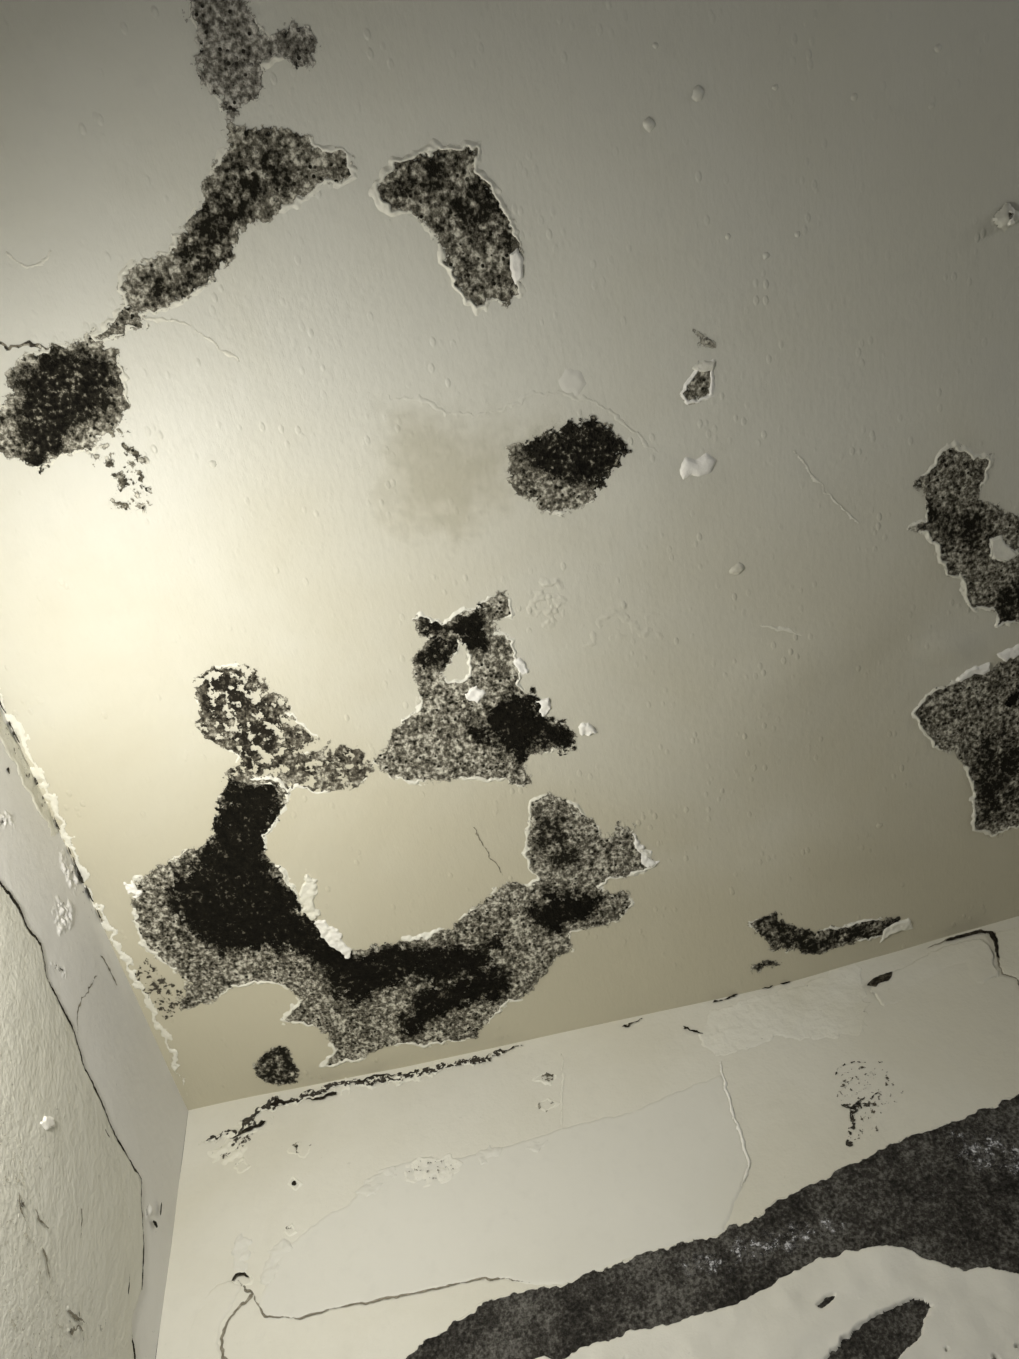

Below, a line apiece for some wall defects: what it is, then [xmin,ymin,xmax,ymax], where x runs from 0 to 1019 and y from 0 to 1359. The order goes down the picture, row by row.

peeling [0,0,526,513]
peeling [505,415,632,517]
peeling [906,440,1019,628]
peeling [123,590,660,1068]
peeling [911,644,1019,837]
peeling [747,911,913,973]
peeling [867,927,1019,1006]
peeling [231,1062,1019,1359]